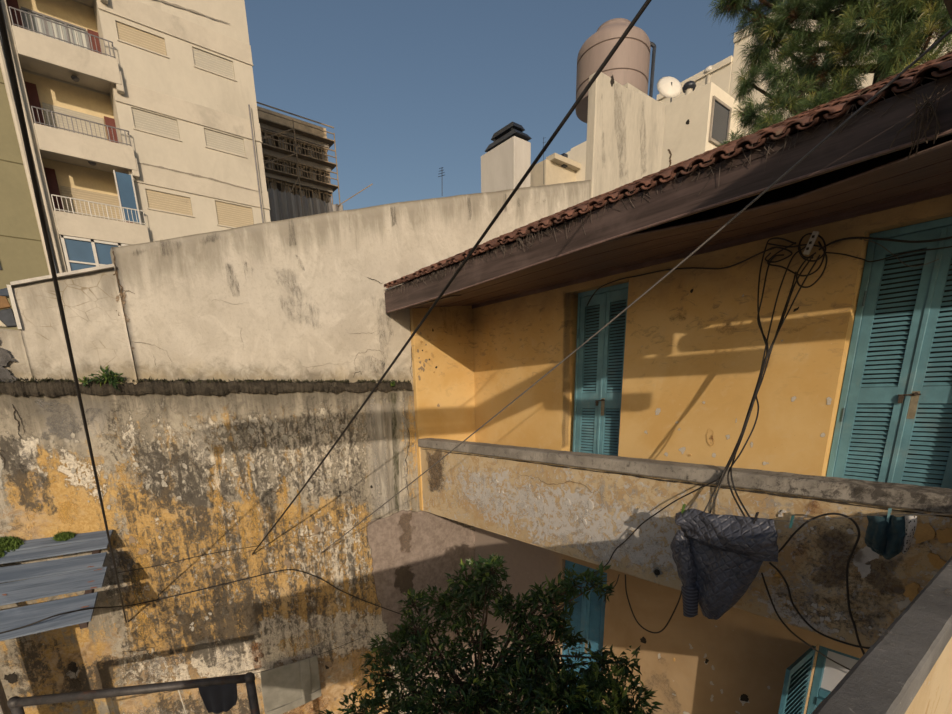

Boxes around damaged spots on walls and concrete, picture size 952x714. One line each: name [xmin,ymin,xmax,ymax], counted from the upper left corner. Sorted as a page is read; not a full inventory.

peeling [122,453,168,490]
peeling [847,528,879,578]
water stain [394,565,415,593]